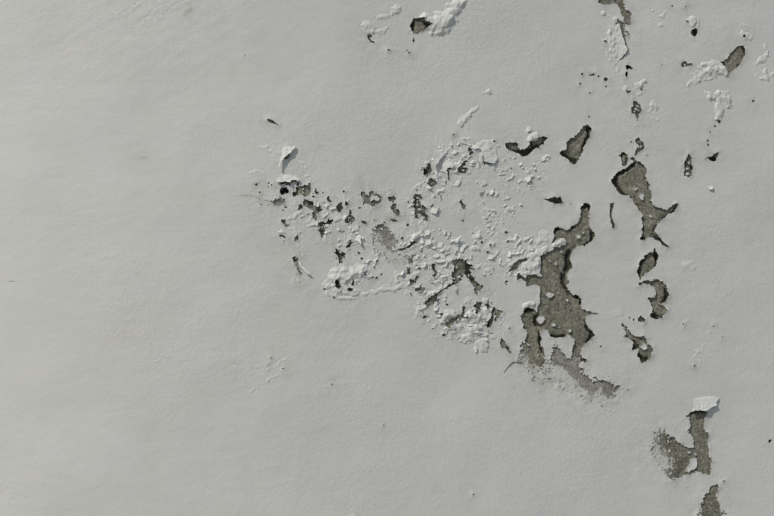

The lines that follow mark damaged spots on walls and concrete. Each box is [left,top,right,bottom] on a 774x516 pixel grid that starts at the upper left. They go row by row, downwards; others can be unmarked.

peeling [598,0,633,77]
peeling [721,35,746,74]
peeling [560,116,592,165]
peeling [255,131,629,407]
peeling [611,137,679,363]
peeling [649,396,719,480]
peeling [697,480,727,516]